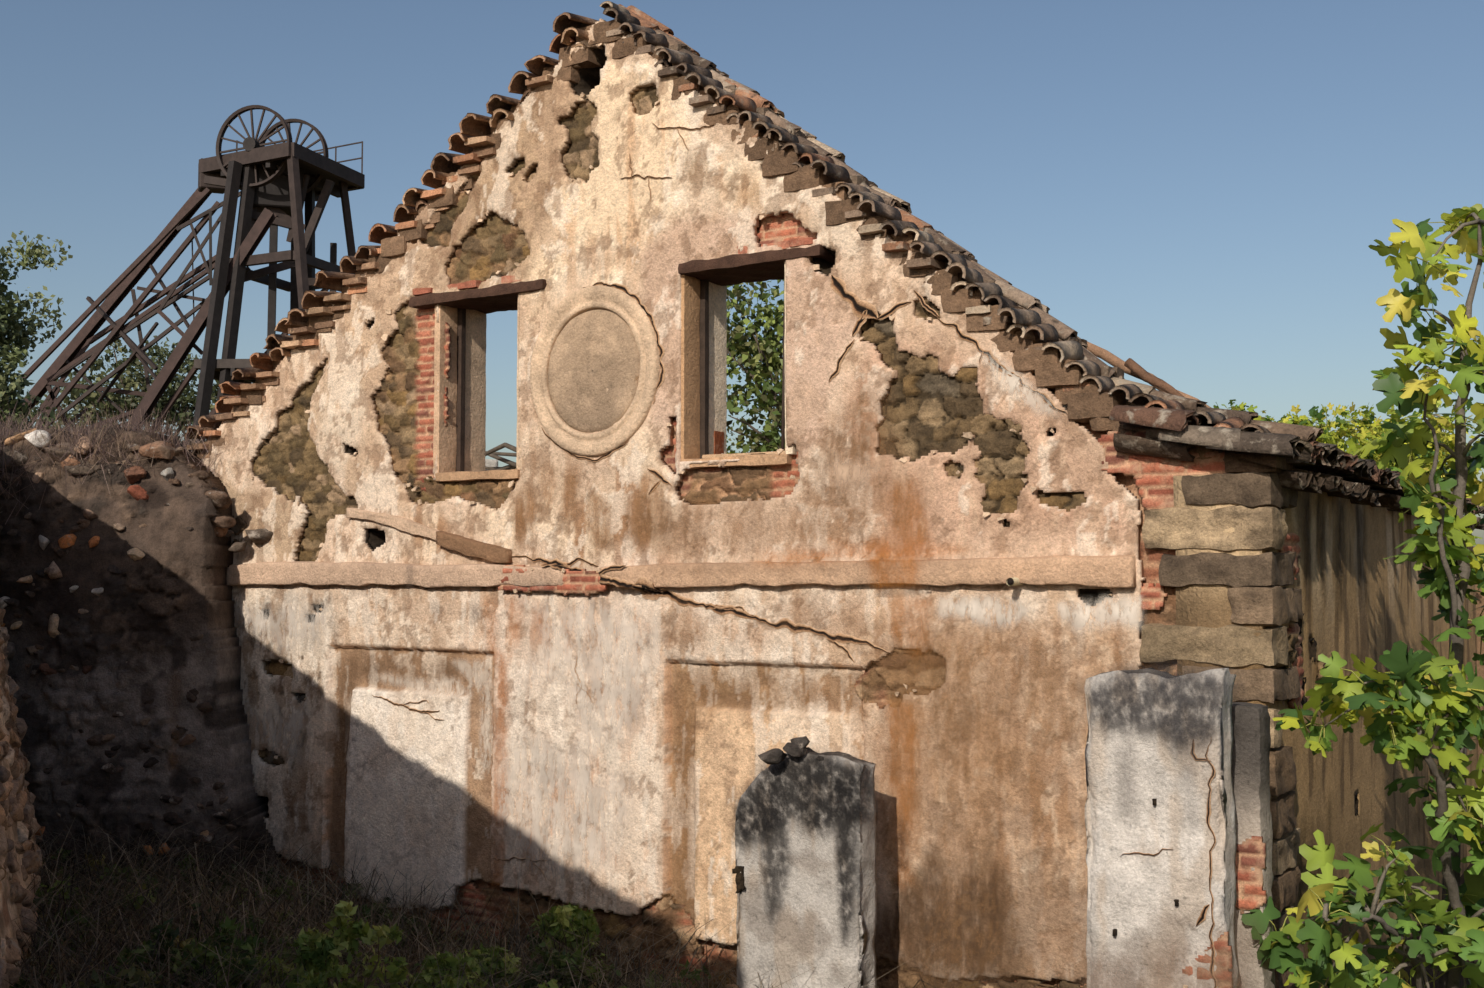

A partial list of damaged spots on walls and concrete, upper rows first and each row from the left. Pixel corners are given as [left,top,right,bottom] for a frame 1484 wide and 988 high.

spalling [561,43,607,183]
spalling [632,86,660,115]
spalling [423,169,530,284]
spalling [248,359,358,561]
spalling [365,304,518,510]
spalling [836,313,1087,527]
crack [512,555,894,662]
crack [574,656,593,704]
spalling [854,648,946,709]
spalling [732,866,746,893]
damp [763,814,786,914]
damp [837,783,856,932]